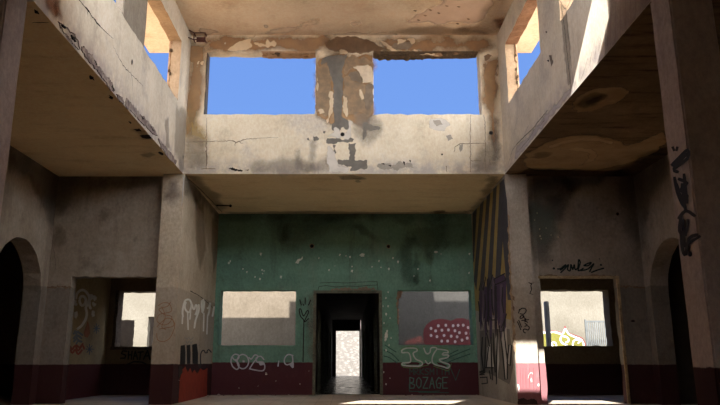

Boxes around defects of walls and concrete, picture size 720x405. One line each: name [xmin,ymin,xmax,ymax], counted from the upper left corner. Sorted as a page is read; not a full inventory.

crack [79,0,138,86]
spalling [57,21,177,164]
crack [189,118,278,212]
flaking render [261,36,499,173]
leakage [516,87,666,170]